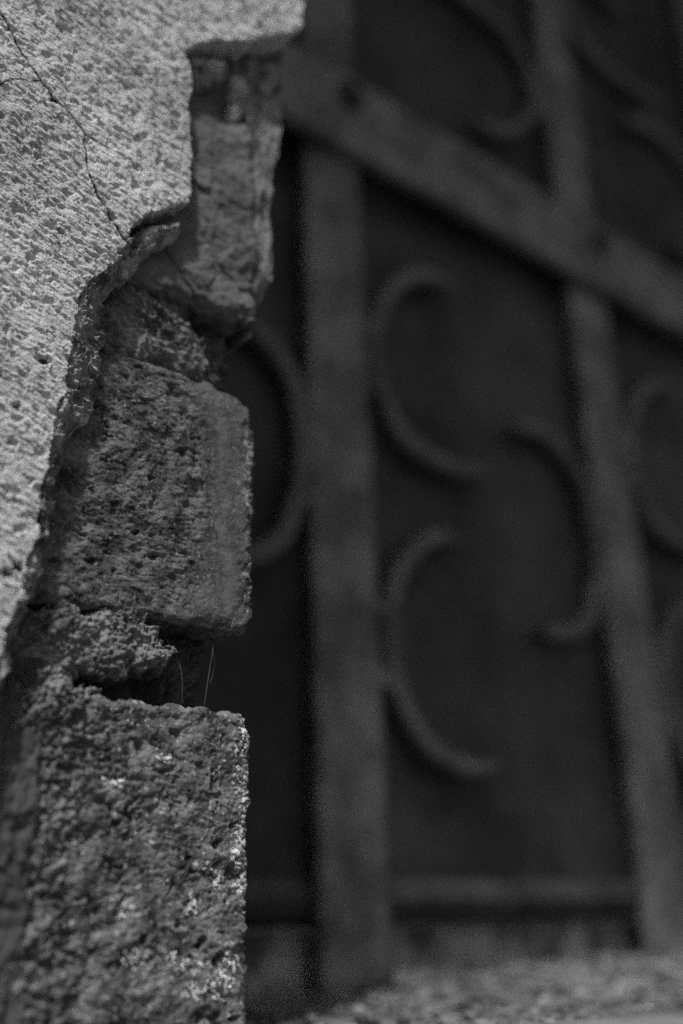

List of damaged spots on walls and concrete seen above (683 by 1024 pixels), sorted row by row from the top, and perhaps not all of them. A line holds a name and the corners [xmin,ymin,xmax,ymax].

crack [0,12,142,241]
spalling [185,56,279,125]
spalling [0,221,215,703]
spalling [241,429,254,526]
spalling [242,553,252,618]
spalling [183,683,197,708]